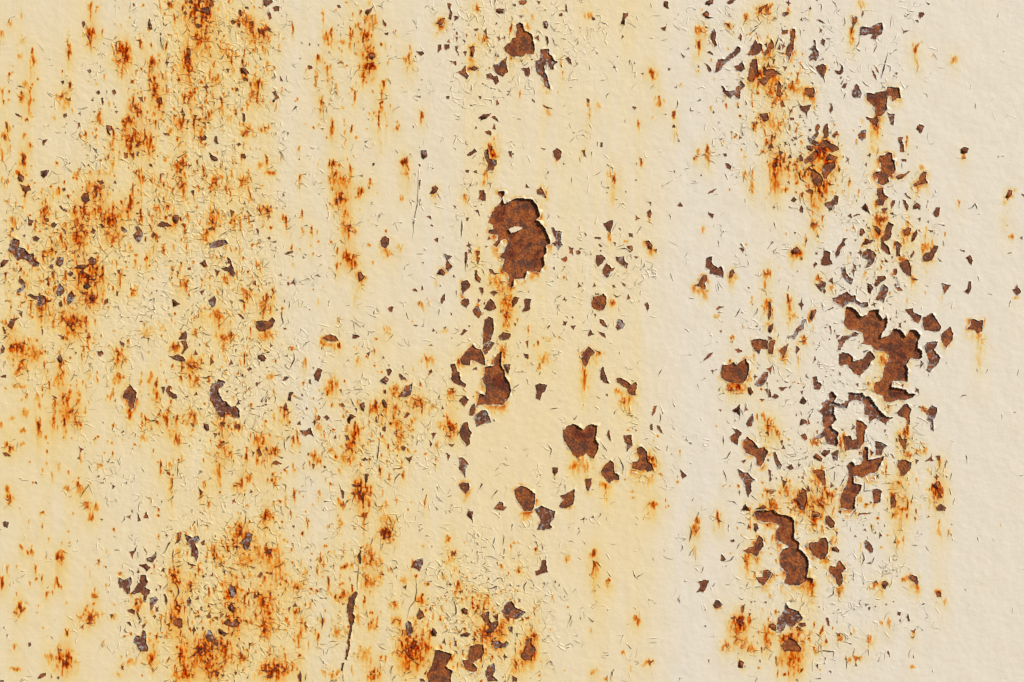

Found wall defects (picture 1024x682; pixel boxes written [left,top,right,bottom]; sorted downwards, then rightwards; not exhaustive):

peeling [415,2,572,91]
corrosion [5,41,167,340]
corrosion [769,156,830,239]
corrosion [10,336,94,438]
corrosion [128,345,210,443]
peeling [203,378,242,444]
corrosion [313,380,380,462]
peeling [434,183,581,494]
peeling [694,0,985,587]
peeling [494,422,656,531]
corrosion [208,521,272,633]
corrosion [156,598,248,678]